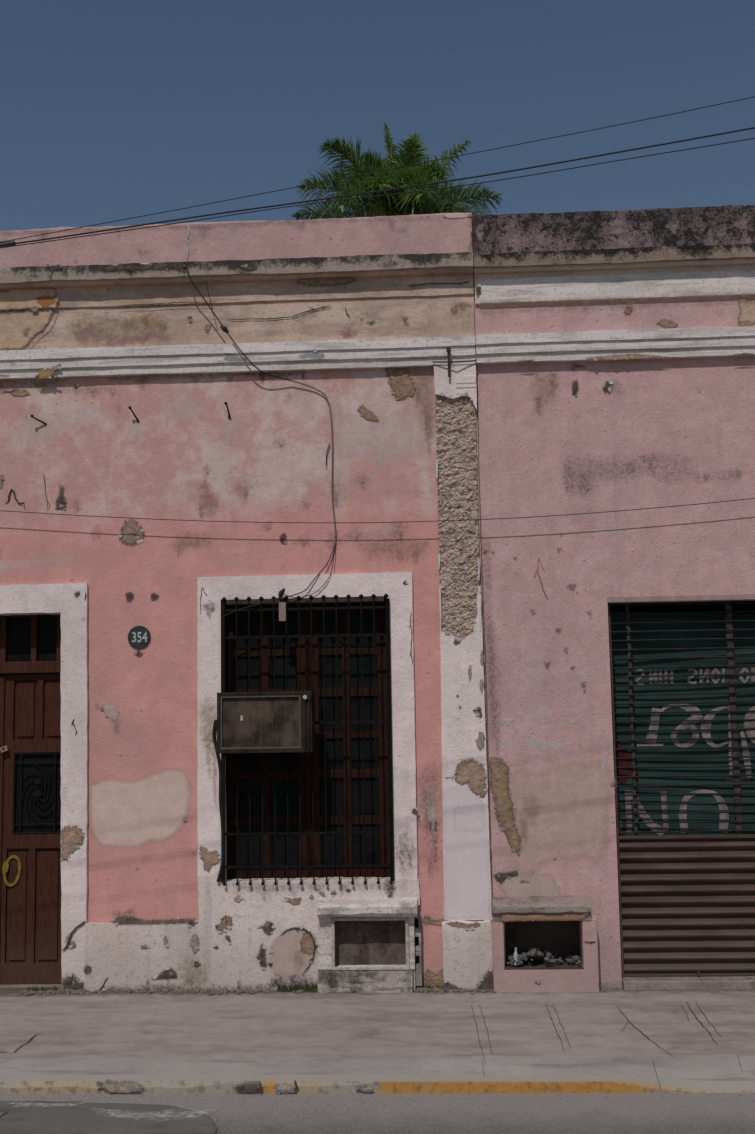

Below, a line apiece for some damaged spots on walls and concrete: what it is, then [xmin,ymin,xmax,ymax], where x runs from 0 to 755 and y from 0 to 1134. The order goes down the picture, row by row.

peeling [737,296,755,326]
flaking render [357,404,379,422]
flaking render [118,517,145,547]
flaking render [435,392,482,645]
peeling [456,650,484,717]
flaking render [453,732,522,855]
flaking render [59,824,85,862]
flaking render [198,847,221,872]
flaking render [497,871,518,884]
peeling [111,910,201,968]
flaking render [213,915,233,950]